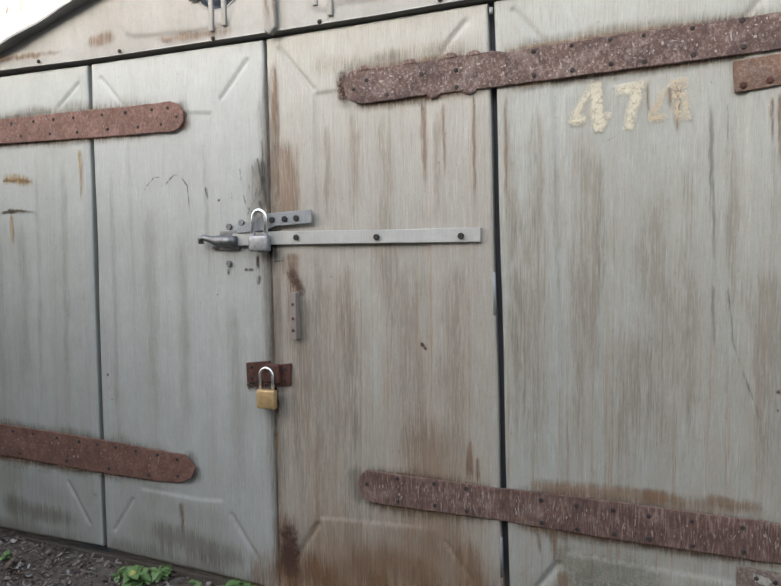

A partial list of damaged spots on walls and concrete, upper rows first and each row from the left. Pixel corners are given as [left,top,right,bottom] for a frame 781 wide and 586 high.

corrosion [337,74,346,100]
corrosion [288,270,303,291]